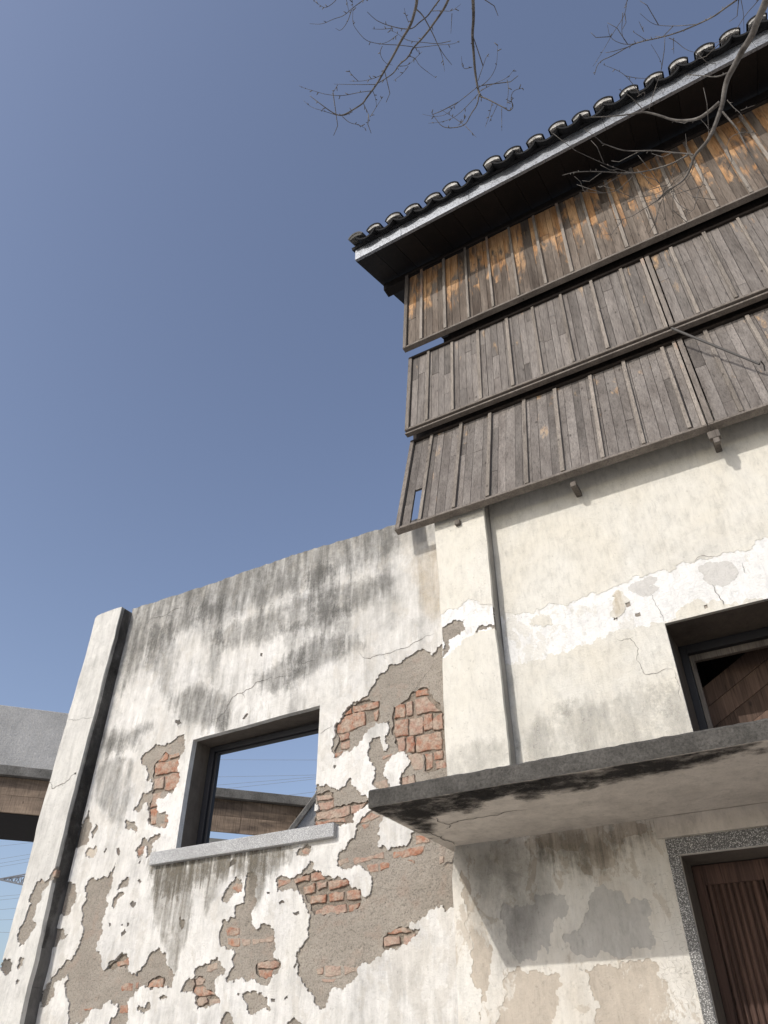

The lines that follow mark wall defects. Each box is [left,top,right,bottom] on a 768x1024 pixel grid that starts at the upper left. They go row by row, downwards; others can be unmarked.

damp [168,545,329,632]
peeling [1,537,768,1024]
damp [368,743,763,833]
damp [151,845,290,962]